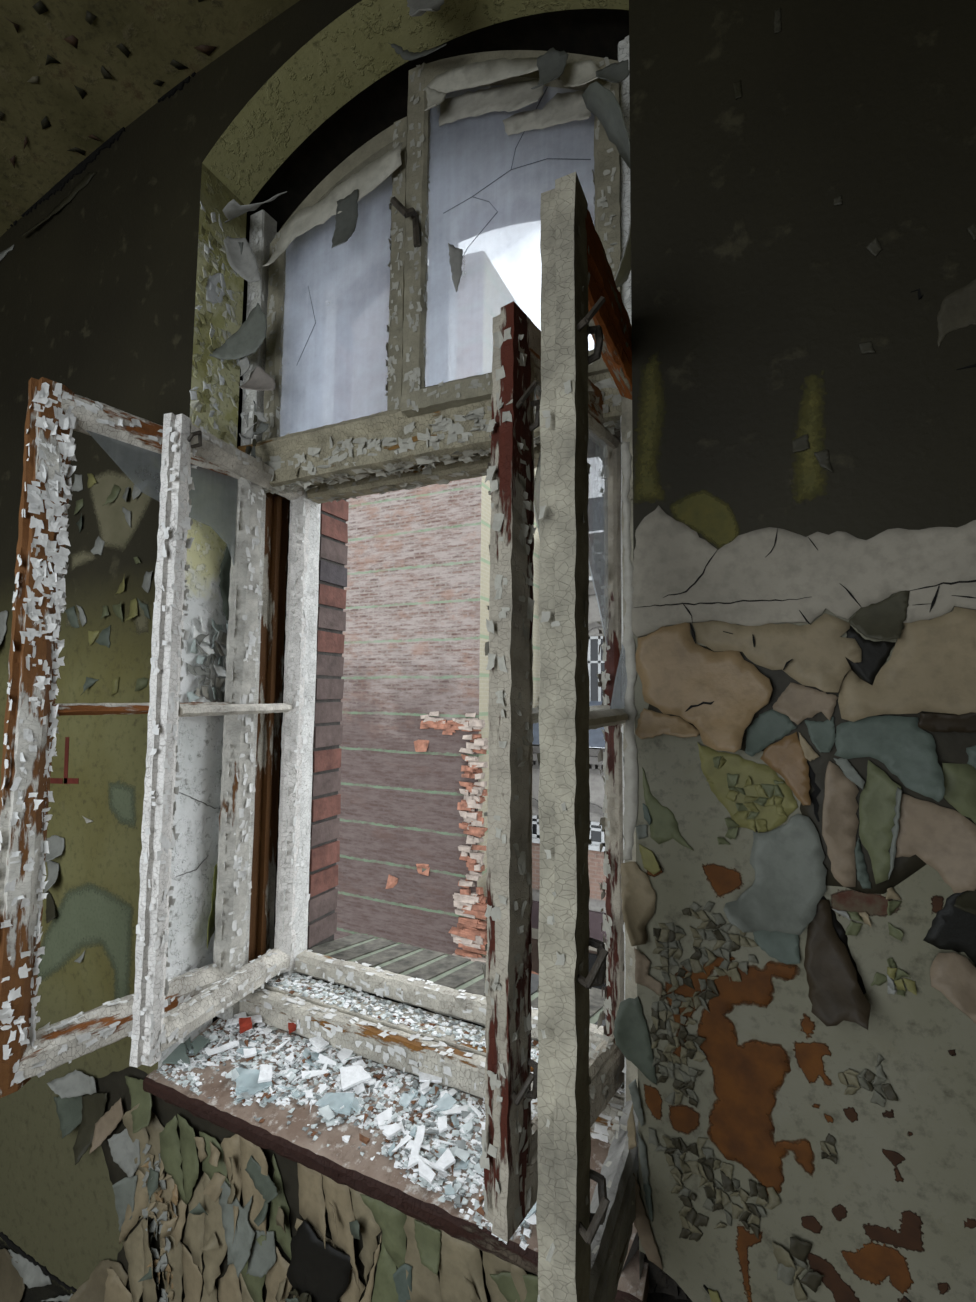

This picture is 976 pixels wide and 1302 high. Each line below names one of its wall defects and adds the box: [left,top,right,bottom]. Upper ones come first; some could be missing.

peeling [189,142,403,441]
peeling [0,610,8,645]
crack [634,549,811,647]
crack [910,580,976,611]
crack [685,701,714,712]
flaking render [613,505,976,1302]
peeling [47,1065,538,1302]